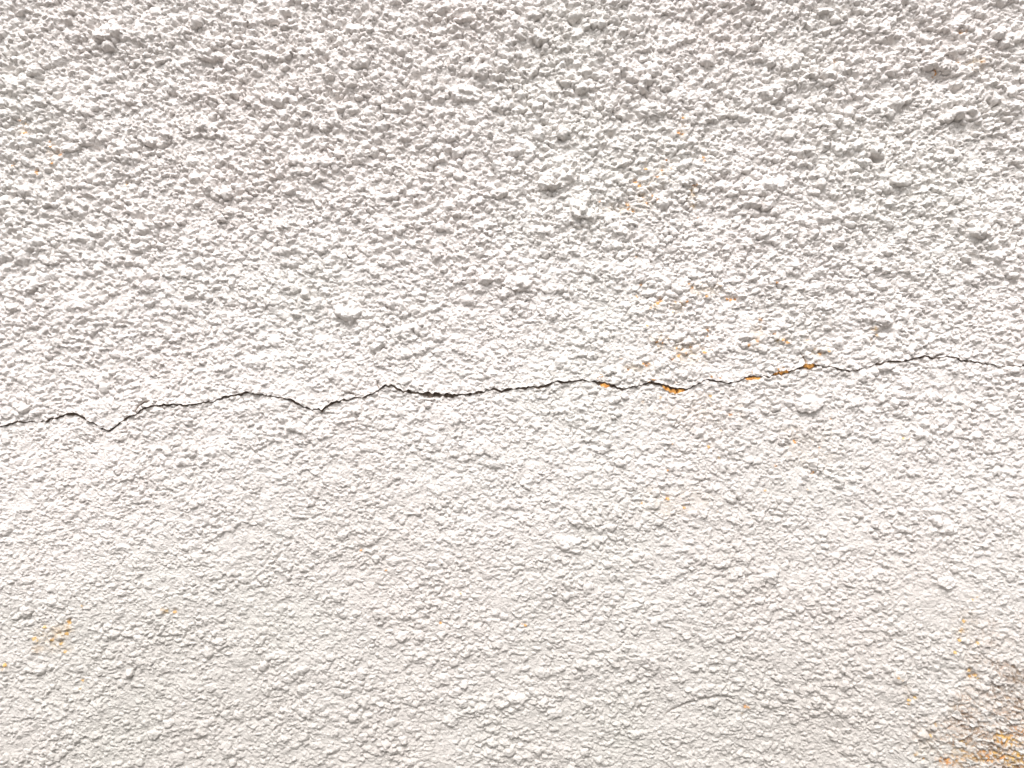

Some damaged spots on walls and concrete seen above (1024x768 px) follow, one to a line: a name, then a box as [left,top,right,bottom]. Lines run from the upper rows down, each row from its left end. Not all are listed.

crack [0,351,1024,432]